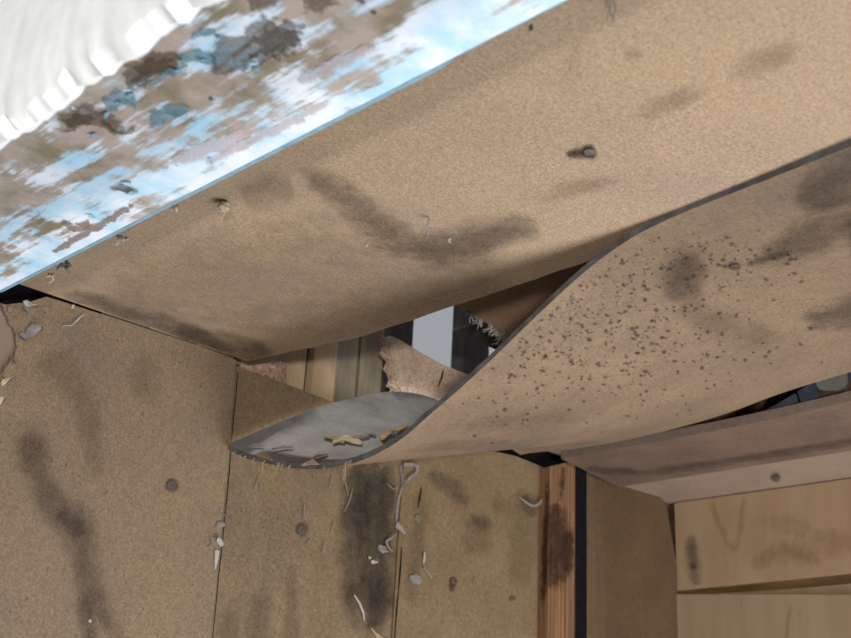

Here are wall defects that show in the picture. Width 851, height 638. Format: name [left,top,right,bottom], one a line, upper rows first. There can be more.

peeling [58,0,304,138]
peeling [299,45,376,84]
peeling [167,101,329,166]
peeling [52,204,134,253]
leakage [540,493,550,599]
crack [394,547,402,638]